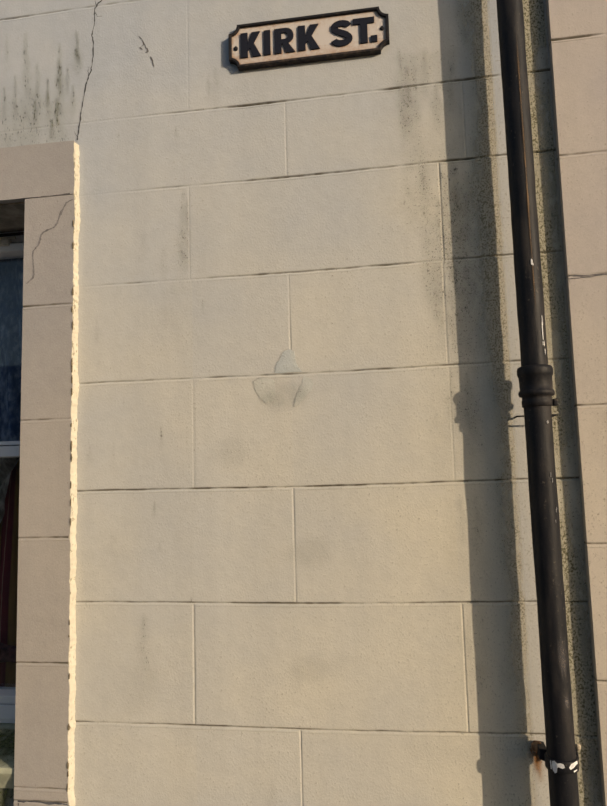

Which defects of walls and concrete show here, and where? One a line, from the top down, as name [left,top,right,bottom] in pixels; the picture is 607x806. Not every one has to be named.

crack [76,0,102,140]
crack [26,193,73,284]